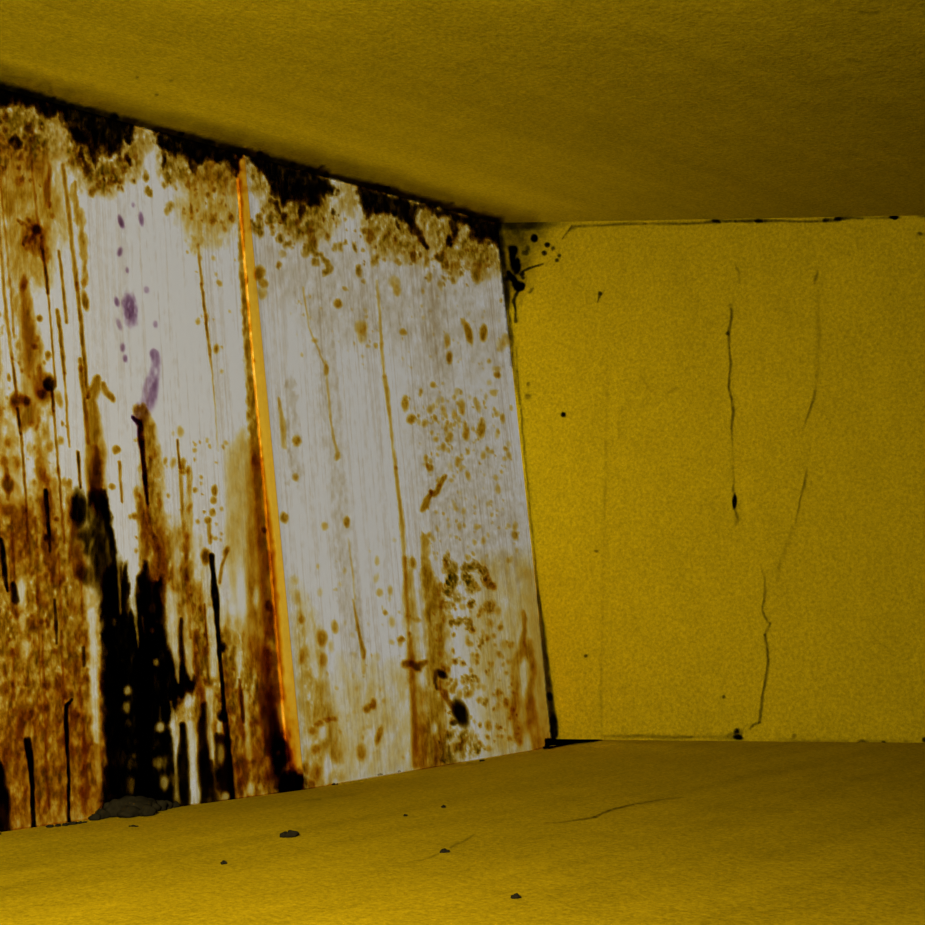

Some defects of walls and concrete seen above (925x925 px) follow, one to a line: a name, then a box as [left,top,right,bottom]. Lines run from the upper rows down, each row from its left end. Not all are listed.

rust [383,368,393,439]
crack [724,307,734,438]
rust [133,404,166,603]
water stain [0,83,561,832]
rust [393,453,404,538]
rust [420,474,447,512]
crack [730,495,738,509]
rust [354,607,366,659]
crack [756,571,769,722]
rust [410,680,418,768]